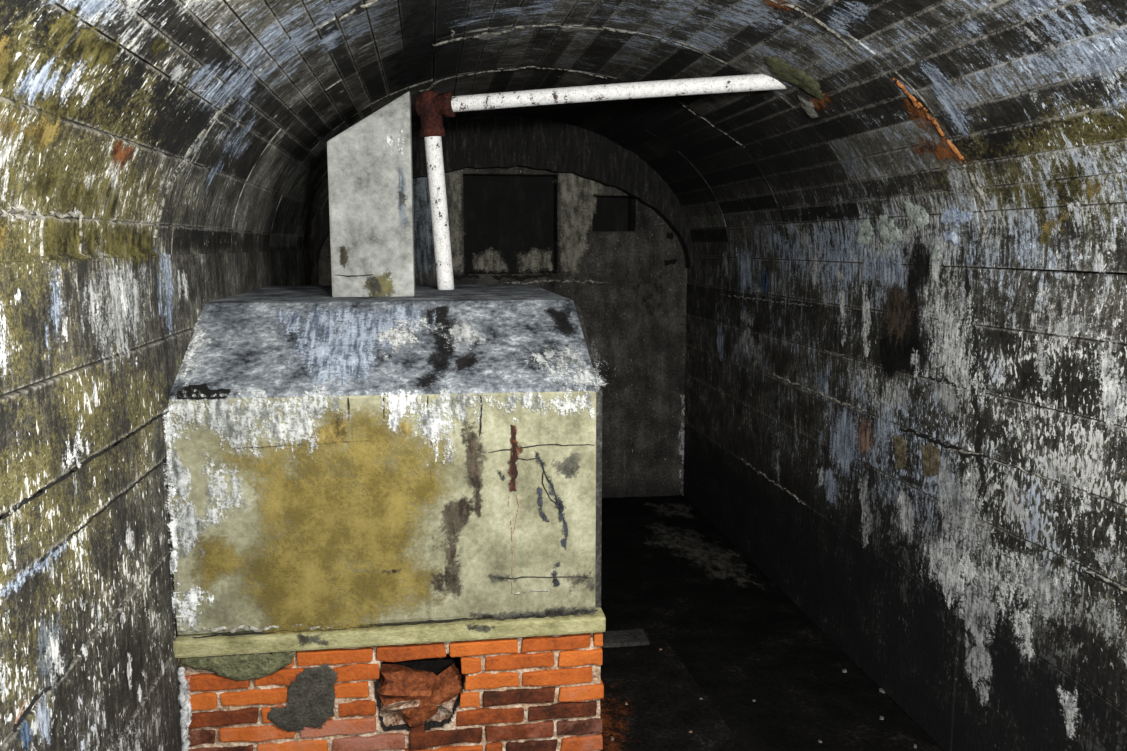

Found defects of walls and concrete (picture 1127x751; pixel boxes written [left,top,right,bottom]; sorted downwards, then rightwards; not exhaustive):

damp [14,58,92,109]
crack [339,0,378,21]
crack [419,66,607,92]
crack [432,24,633,46]
crack [771,0,854,50]
damp [387,131,435,281]
damp [447,170,603,288]
damp [45,245,189,369]
damp [159,303,607,646]
corrosion [507,418,523,588]
damp [897,458,1072,705]
spalling [377,663,462,727]